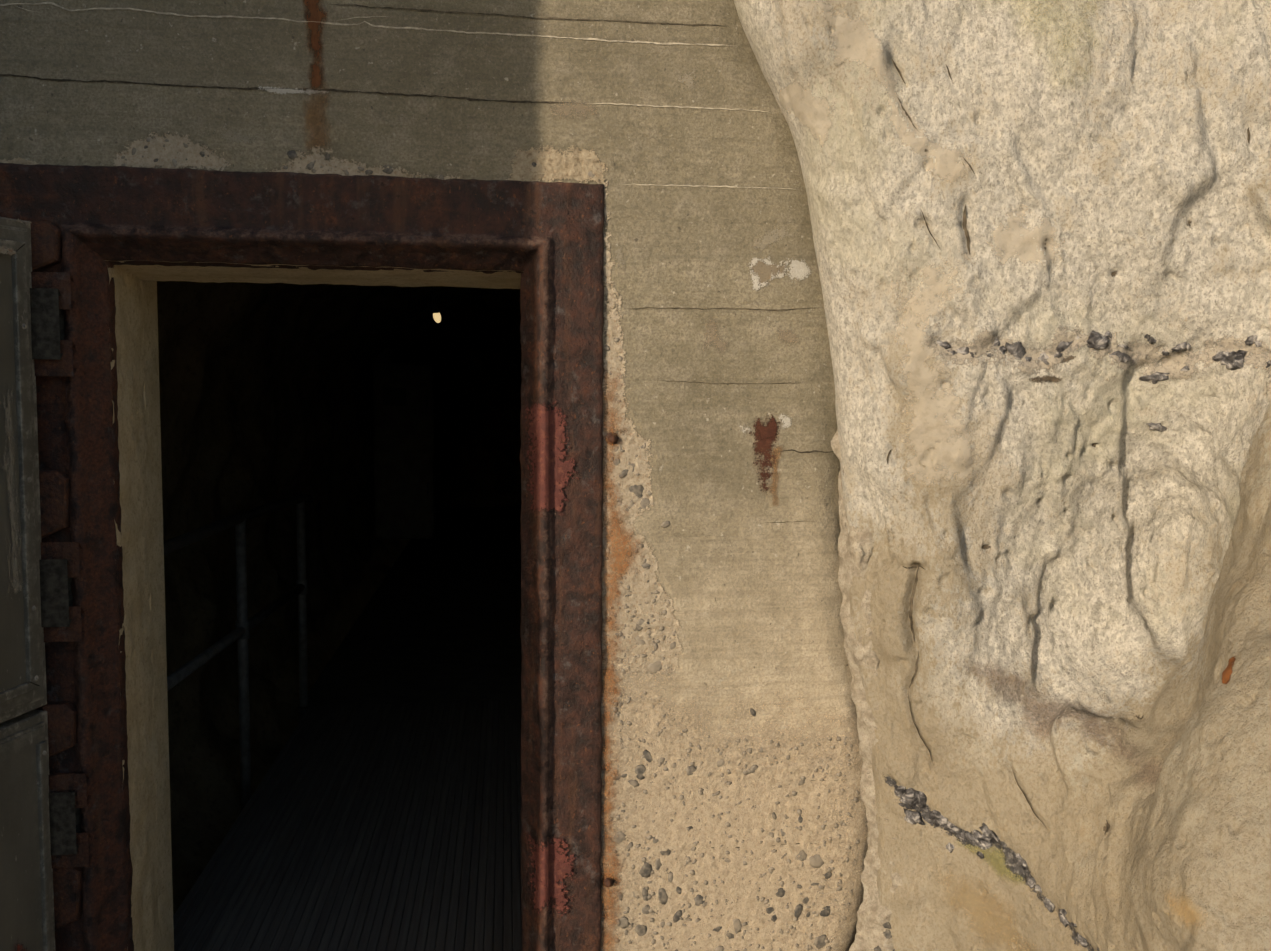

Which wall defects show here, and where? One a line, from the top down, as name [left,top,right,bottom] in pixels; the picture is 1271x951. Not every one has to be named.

spalling [113,131,231,171]
corrosion [303,0,327,149]
crack [0,74,770,113]
corrosion [749,412,781,503]
spalling [506,144,868,951]
corrosion [600,378,637,951]